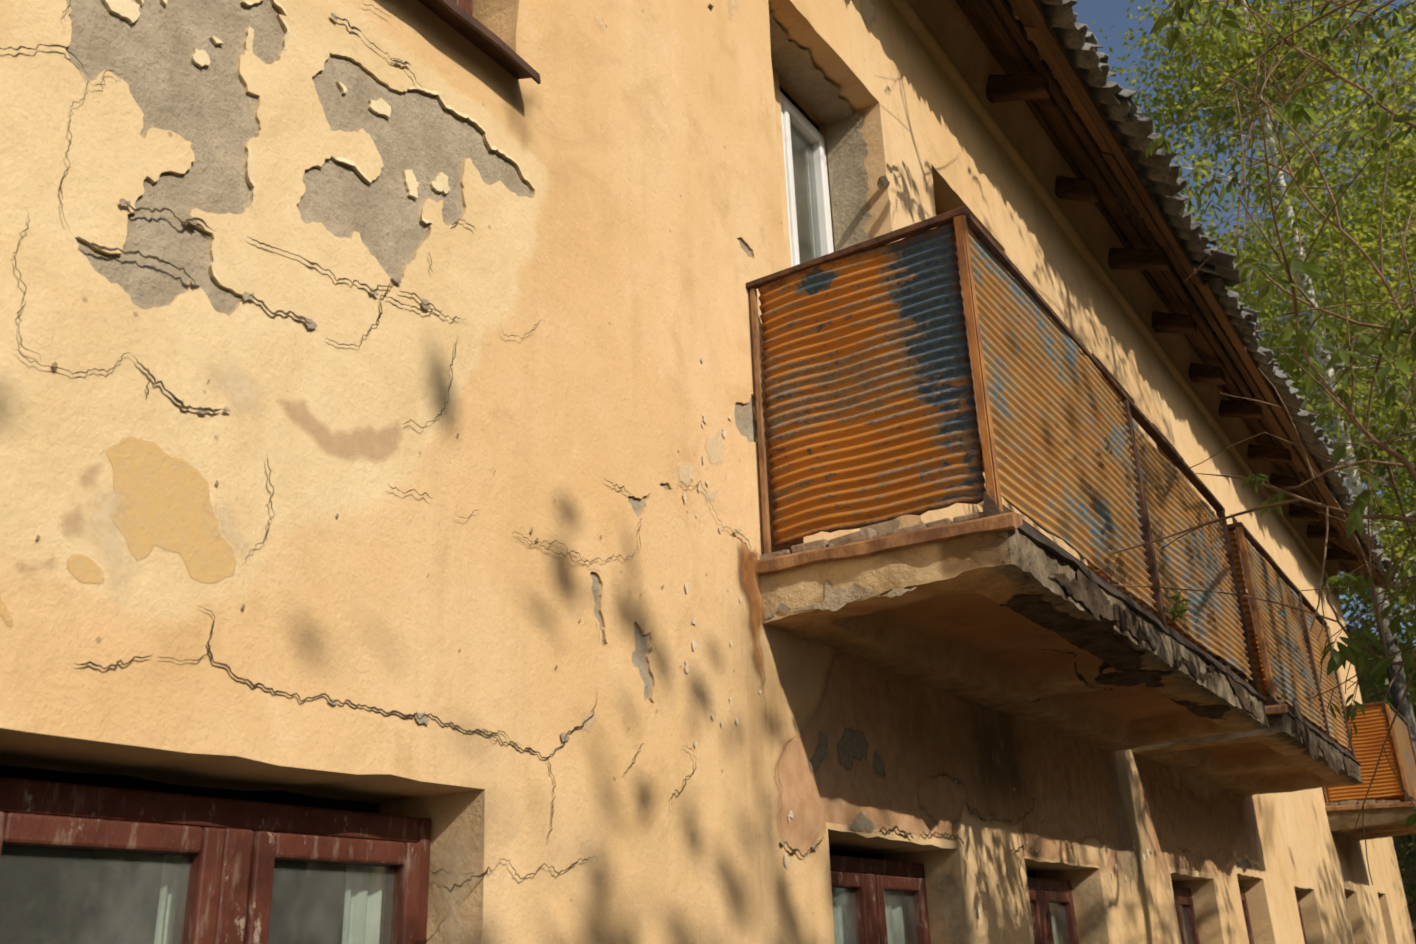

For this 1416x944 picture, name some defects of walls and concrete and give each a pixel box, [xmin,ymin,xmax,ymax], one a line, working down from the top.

crack [330,3,423,88]
crack [0,0,232,414]
flaking render [65,0,290,316]
flaking render [296,55,536,279]
crack [242,237,464,428]
peeling [68,554,104,583]
crack [245,453,275,559]
crack [512,479,643,564]
flaking render [579,572,605,647]
flaking render [628,496,647,518]
flaking render [632,623,652,702]
crack [74,606,598,893]